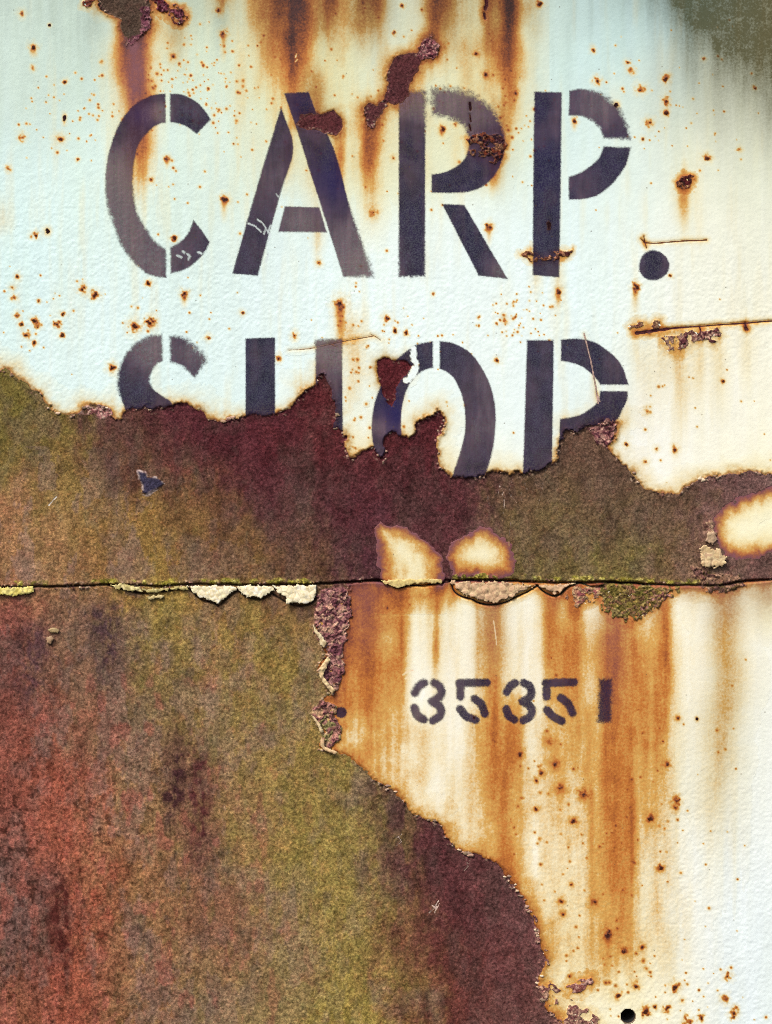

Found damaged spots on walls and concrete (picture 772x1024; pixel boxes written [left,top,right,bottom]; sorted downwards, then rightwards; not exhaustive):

corrosion [25,37,43,75]
corrosion [48,127,83,165]
corrosion [77,0,550,271]
corrosion [667,148,718,236]
peeling [361,341,424,423]
peeling [699,531,728,569]
peeling [0,586,34,597]
peeling [110,583,316,604]
crack [0,573,772,613]
peeling [381,578,576,603]
peeling [313,625,335,694]
corrosion [0,269,772,1024]